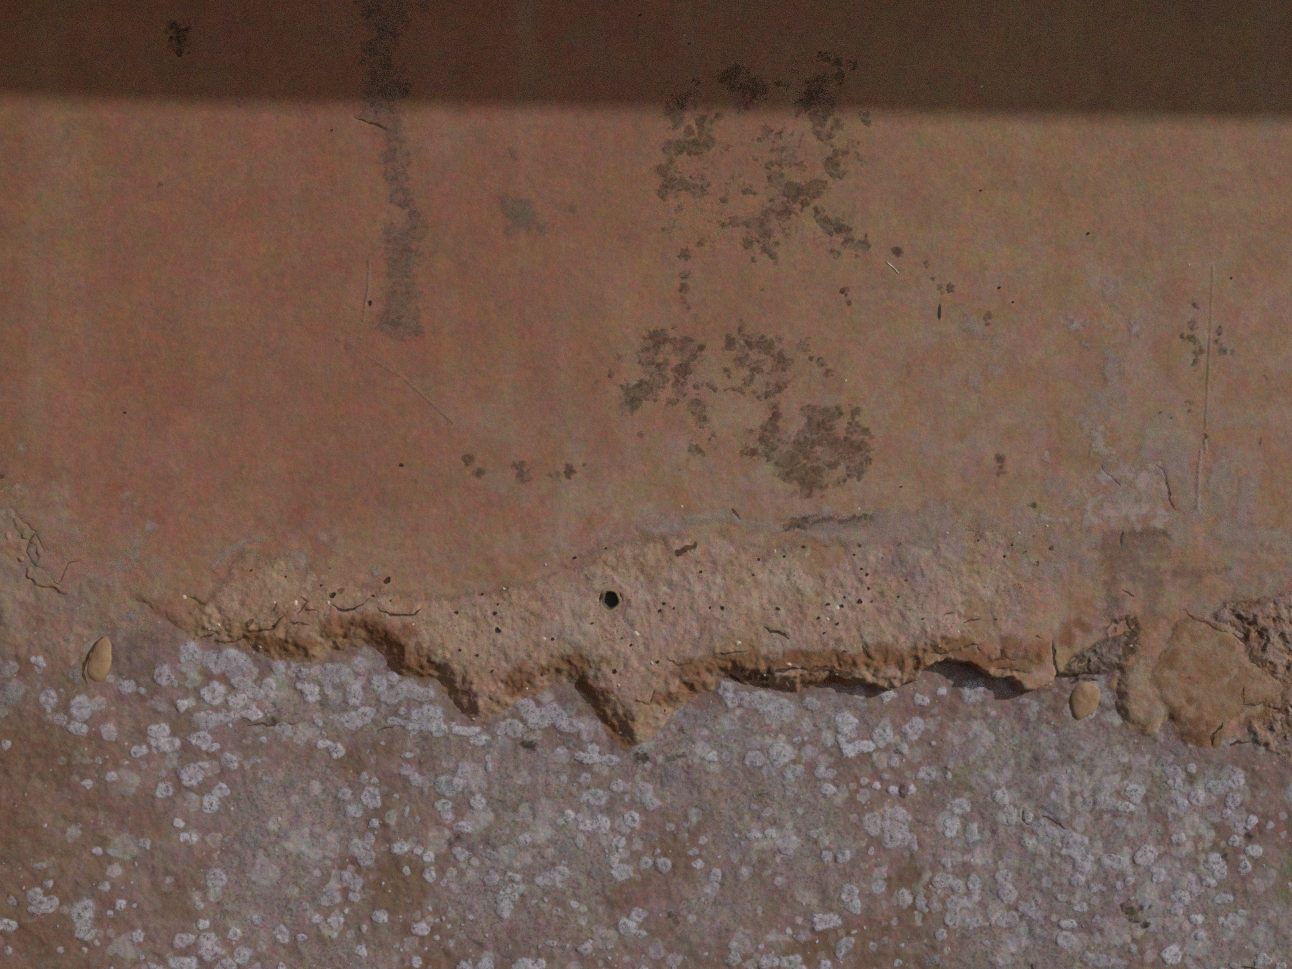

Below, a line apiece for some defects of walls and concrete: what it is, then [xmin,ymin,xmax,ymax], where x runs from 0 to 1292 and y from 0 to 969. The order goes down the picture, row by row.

peeling [675,542,697,557]
spalling [817,544,886,634]
spalling [1066,615,1140,682]
spalling [1217,592,1292,758]